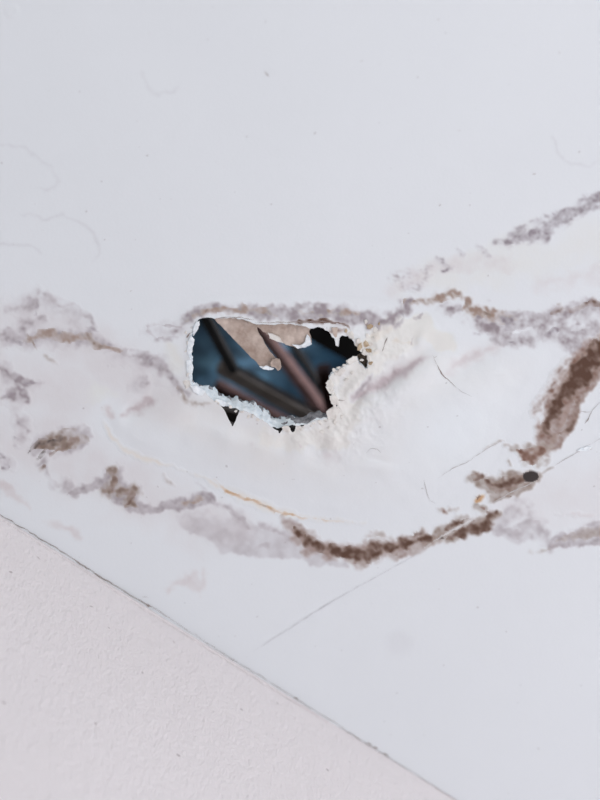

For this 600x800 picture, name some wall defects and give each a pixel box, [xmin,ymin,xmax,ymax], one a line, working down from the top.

leakage [0,189,600,573]
flaking render [183,309,461,471]